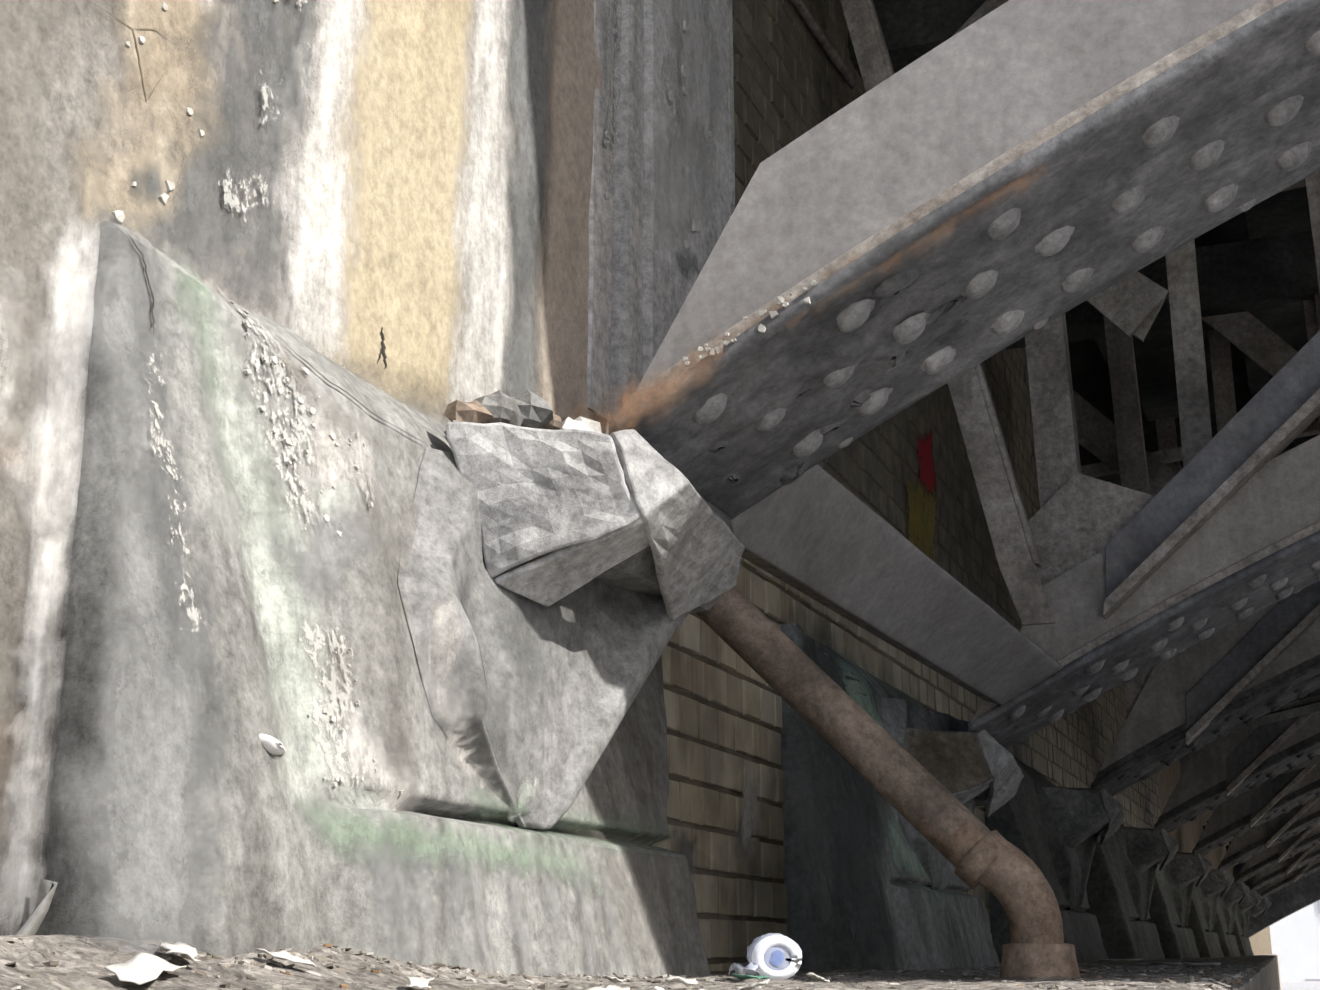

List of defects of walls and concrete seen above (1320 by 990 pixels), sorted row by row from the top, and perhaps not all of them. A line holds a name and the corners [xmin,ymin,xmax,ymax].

crack [125,230,155,334]
peeling [217,284,375,552]
crack [285,343,423,442]
water stain [155,0,602,809]
spalling [444,389,609,436]
corrosion [606,363,704,424]